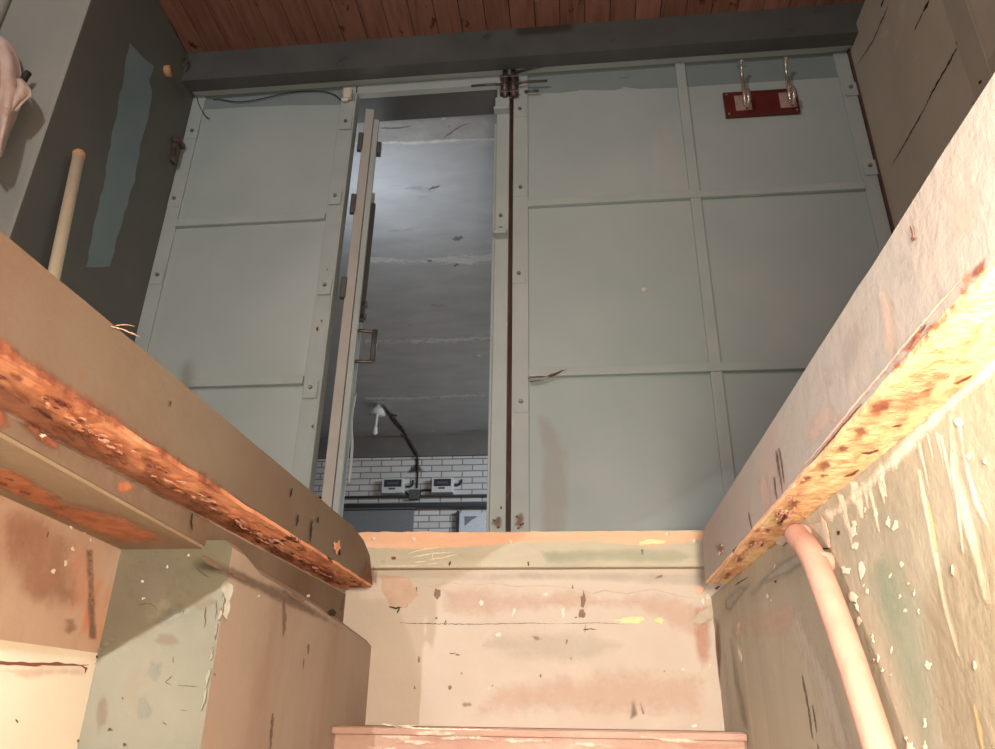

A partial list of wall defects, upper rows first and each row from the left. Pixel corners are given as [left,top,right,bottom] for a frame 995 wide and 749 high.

crack [858,0,887,63]
crack [891,43,957,167]
rust [0,339,124,428]
rust [24,423,58,449]
rust [0,469,154,542]
peeling [41,397,349,590]
peeling [837,520,859,550]
peeling [864,508,898,531]
peeling [841,561,869,626]